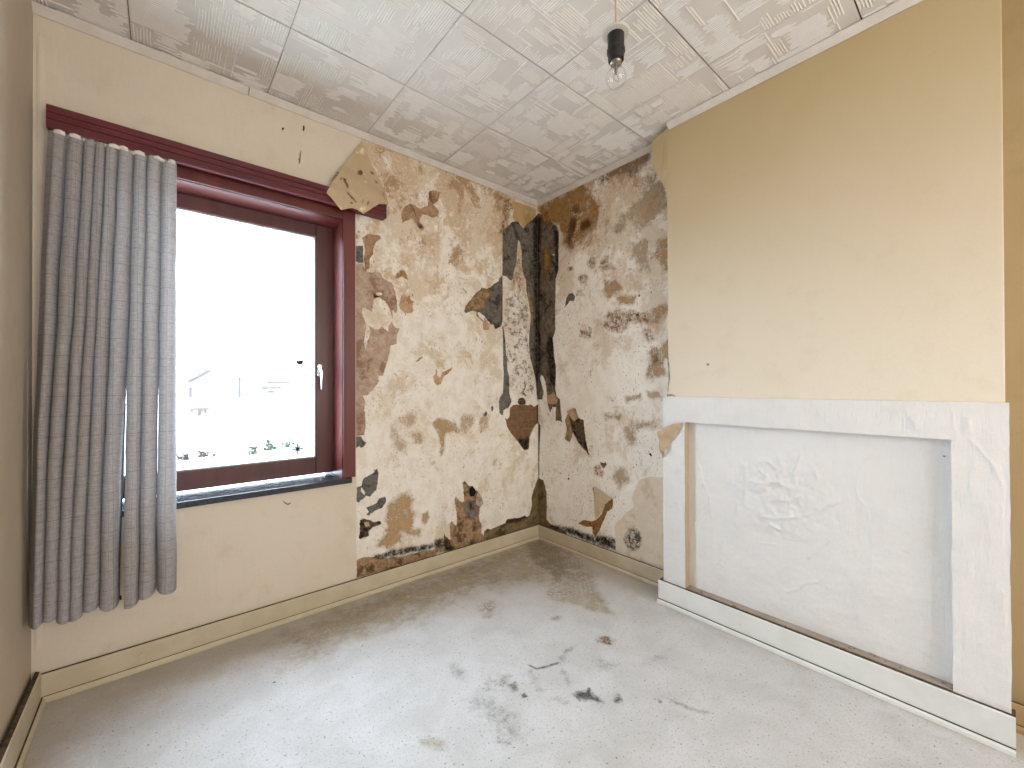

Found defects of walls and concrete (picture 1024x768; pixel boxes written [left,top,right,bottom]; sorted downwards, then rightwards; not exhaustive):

peeling [326,142,390,217]
peeling [411,191,440,221]
spalling [464,276,503,330]
water stain [502,211,562,422]
spalling [433,367,453,386]
flaking render [483,397,538,450]
peeling [565,408,579,442]
water stain [374,494,447,559]
spalling [356,478,567,579]
water stain [555,525,642,551]
peeling [593,486,611,520]